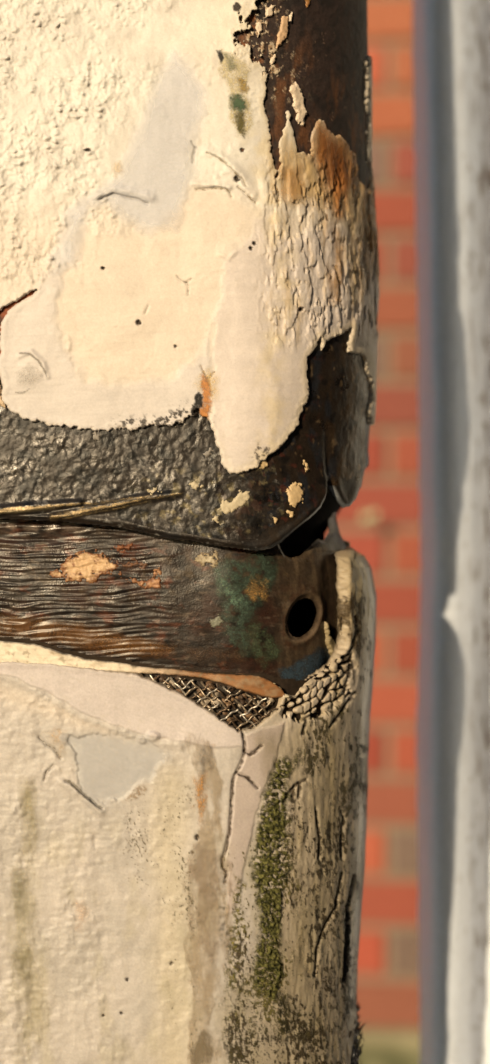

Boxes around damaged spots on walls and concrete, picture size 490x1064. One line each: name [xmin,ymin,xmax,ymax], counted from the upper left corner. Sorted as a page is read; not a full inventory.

peeling [233,0,370,189]
spalling [0,290,36,335]
peeling [0,331,370,568]
peeling [49,543,162,590]
rust [0,616,172,656]
peeling [209,614,224,628]
peeling [324,621,336,656]
damp [335,584,373,689]
spalling [140,673,289,730]
crack [222,730,262,883]
damp [175,693,367,1064]